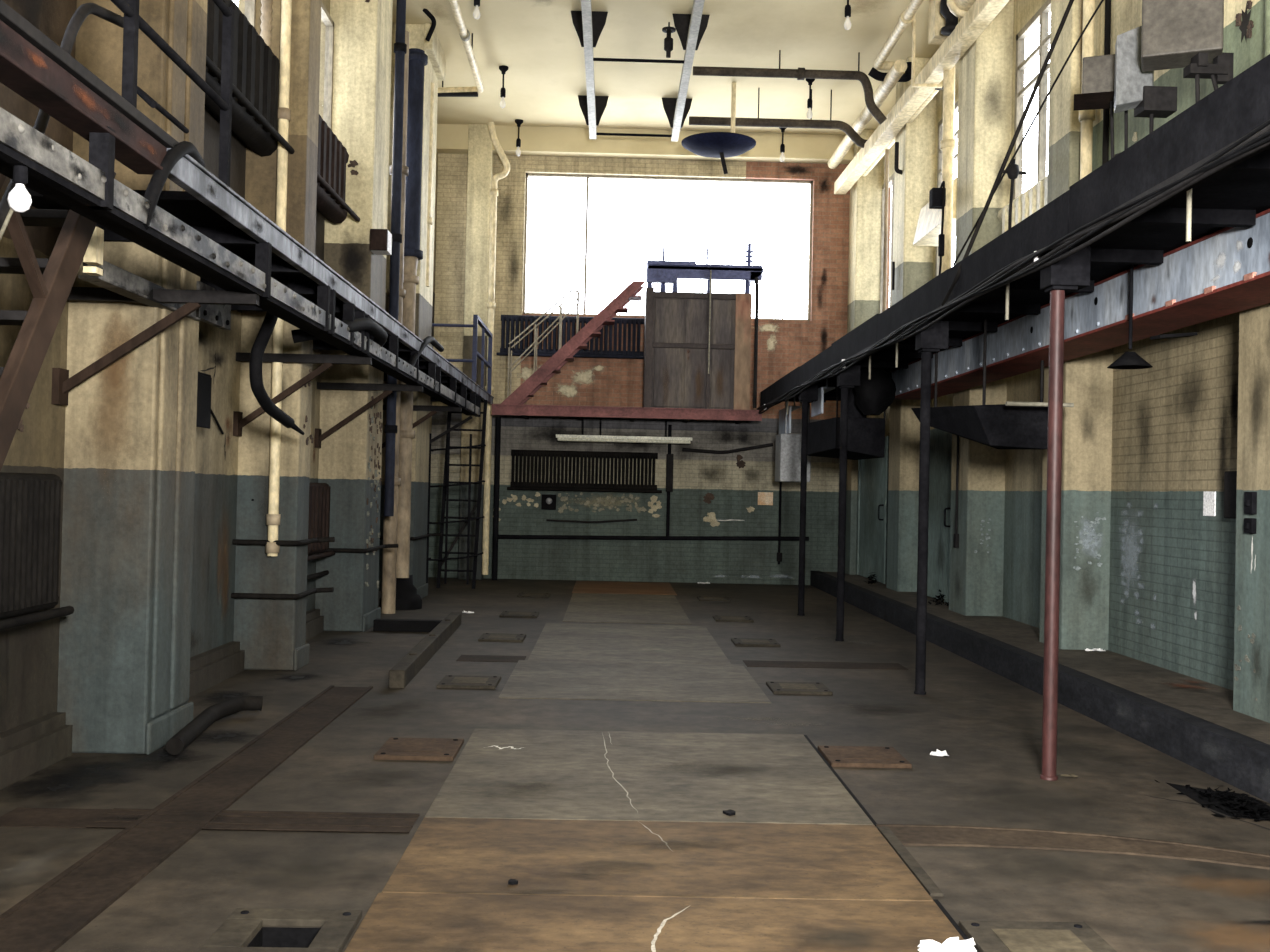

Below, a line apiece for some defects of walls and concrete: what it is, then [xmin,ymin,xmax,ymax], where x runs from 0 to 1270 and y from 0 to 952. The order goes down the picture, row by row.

peeling [365,396,383,589]
peeling [493,492,541,521]
peeling [558,492,662,518]
peeling [1073,512,1106,570]
crack [602,732,671,850]
crack [651,905,691,952]